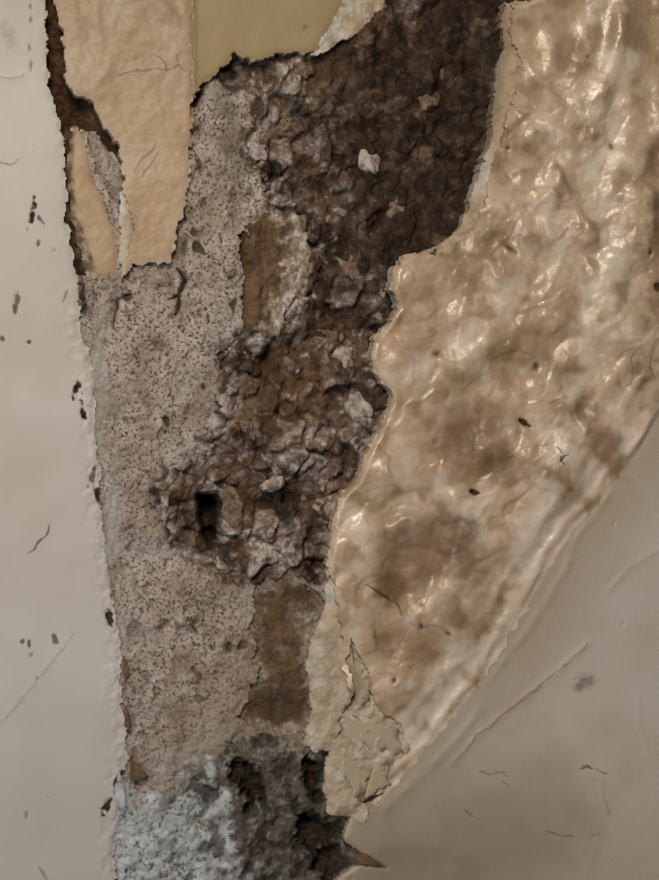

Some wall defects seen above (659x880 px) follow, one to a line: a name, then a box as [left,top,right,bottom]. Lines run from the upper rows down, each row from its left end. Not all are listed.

spalling [53,0,529,880]